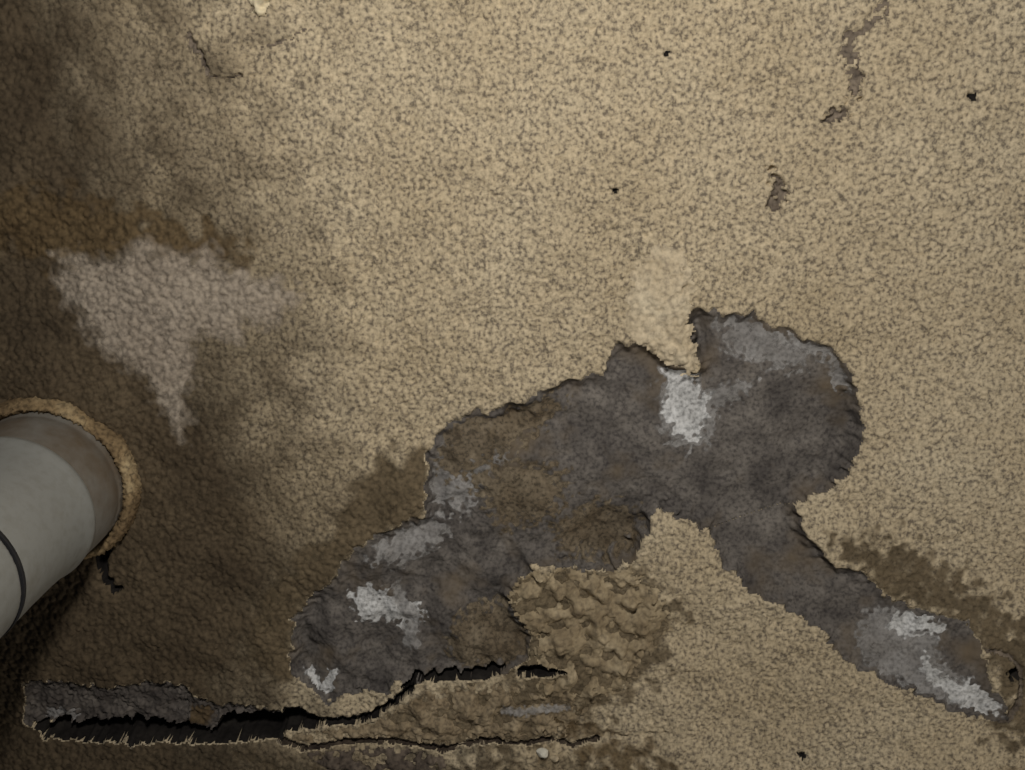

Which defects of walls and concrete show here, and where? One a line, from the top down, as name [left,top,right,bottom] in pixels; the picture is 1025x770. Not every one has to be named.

peeling [248,0,270,18]
spalling [288,307,1024,770]
crack [33,661,600,754]
leakage [391,567,692,765]
leakage [828,533,1025,752]